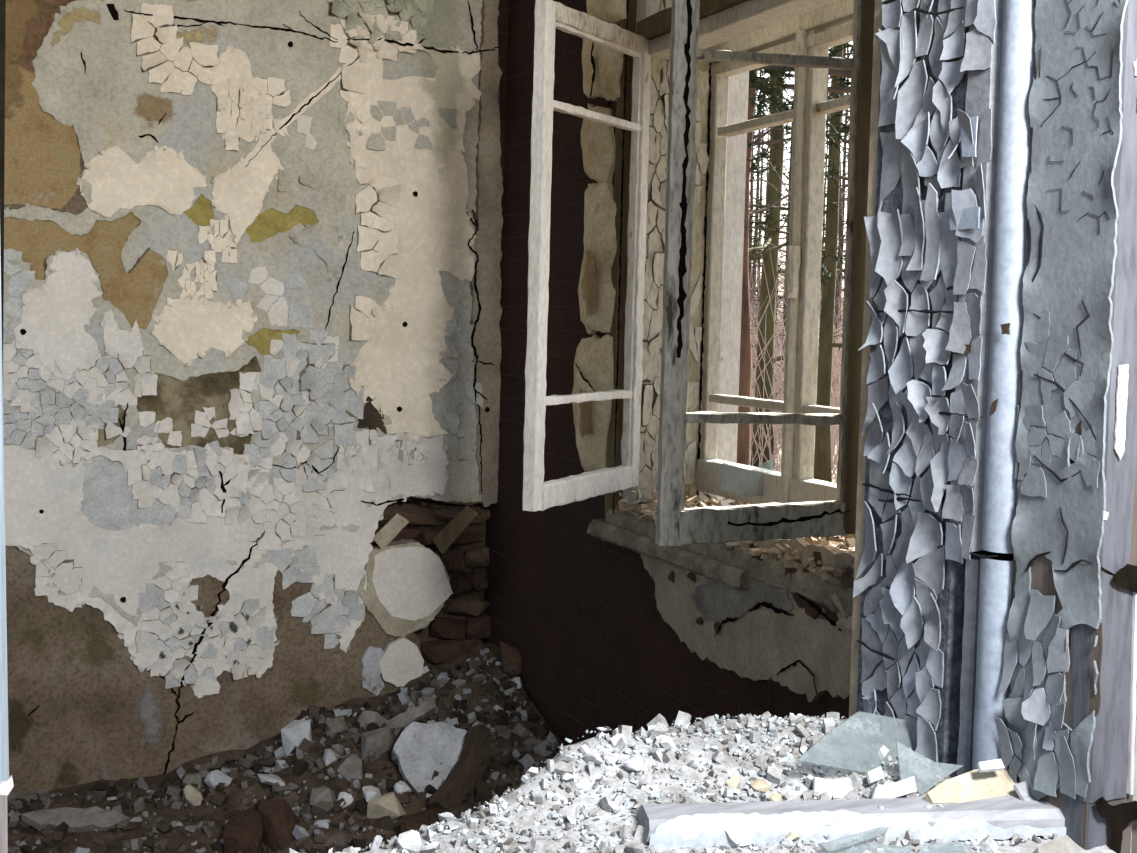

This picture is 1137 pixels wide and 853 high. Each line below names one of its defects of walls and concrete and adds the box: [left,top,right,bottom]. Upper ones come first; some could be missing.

crack [124,2,500,167]
spalling [497,0,509,322]
crack [1026,0,1120,282]
peeling [3,0,491,698]
peeling [668,0,998,772]
peeling [977,0,1137,802]
crack [1019,300,1096,439]
crack [159,537,259,775]